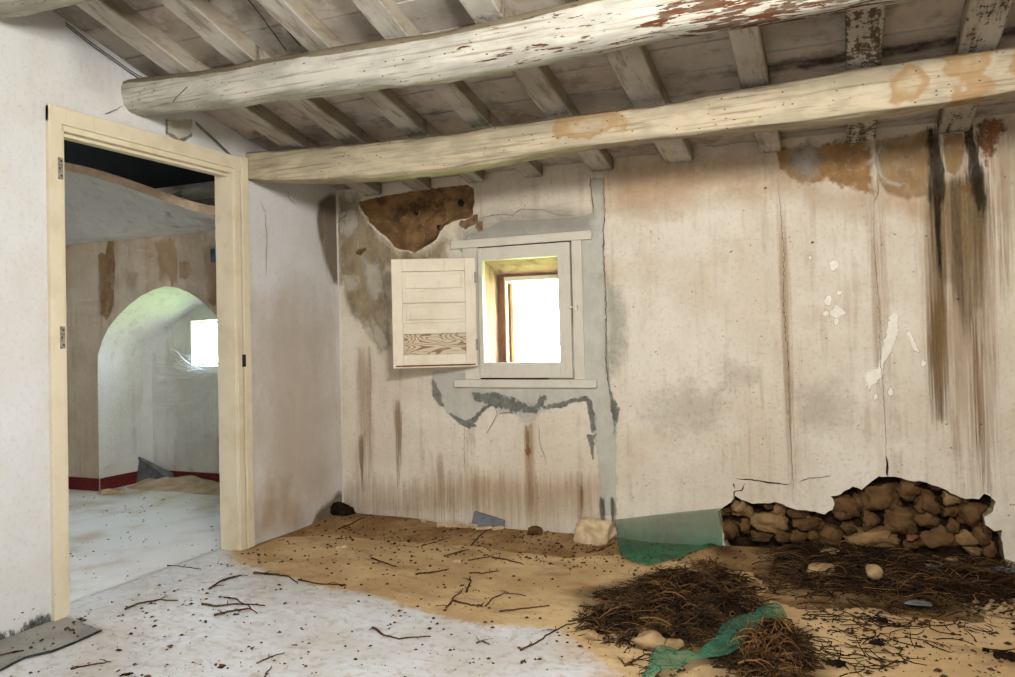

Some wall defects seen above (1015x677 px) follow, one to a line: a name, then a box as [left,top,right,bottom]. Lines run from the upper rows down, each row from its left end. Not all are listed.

flaking render [358,185,483,253]
leakage [928,126,986,436]
peeling [864,313,926,401]
flaking render [722,476,1007,566]